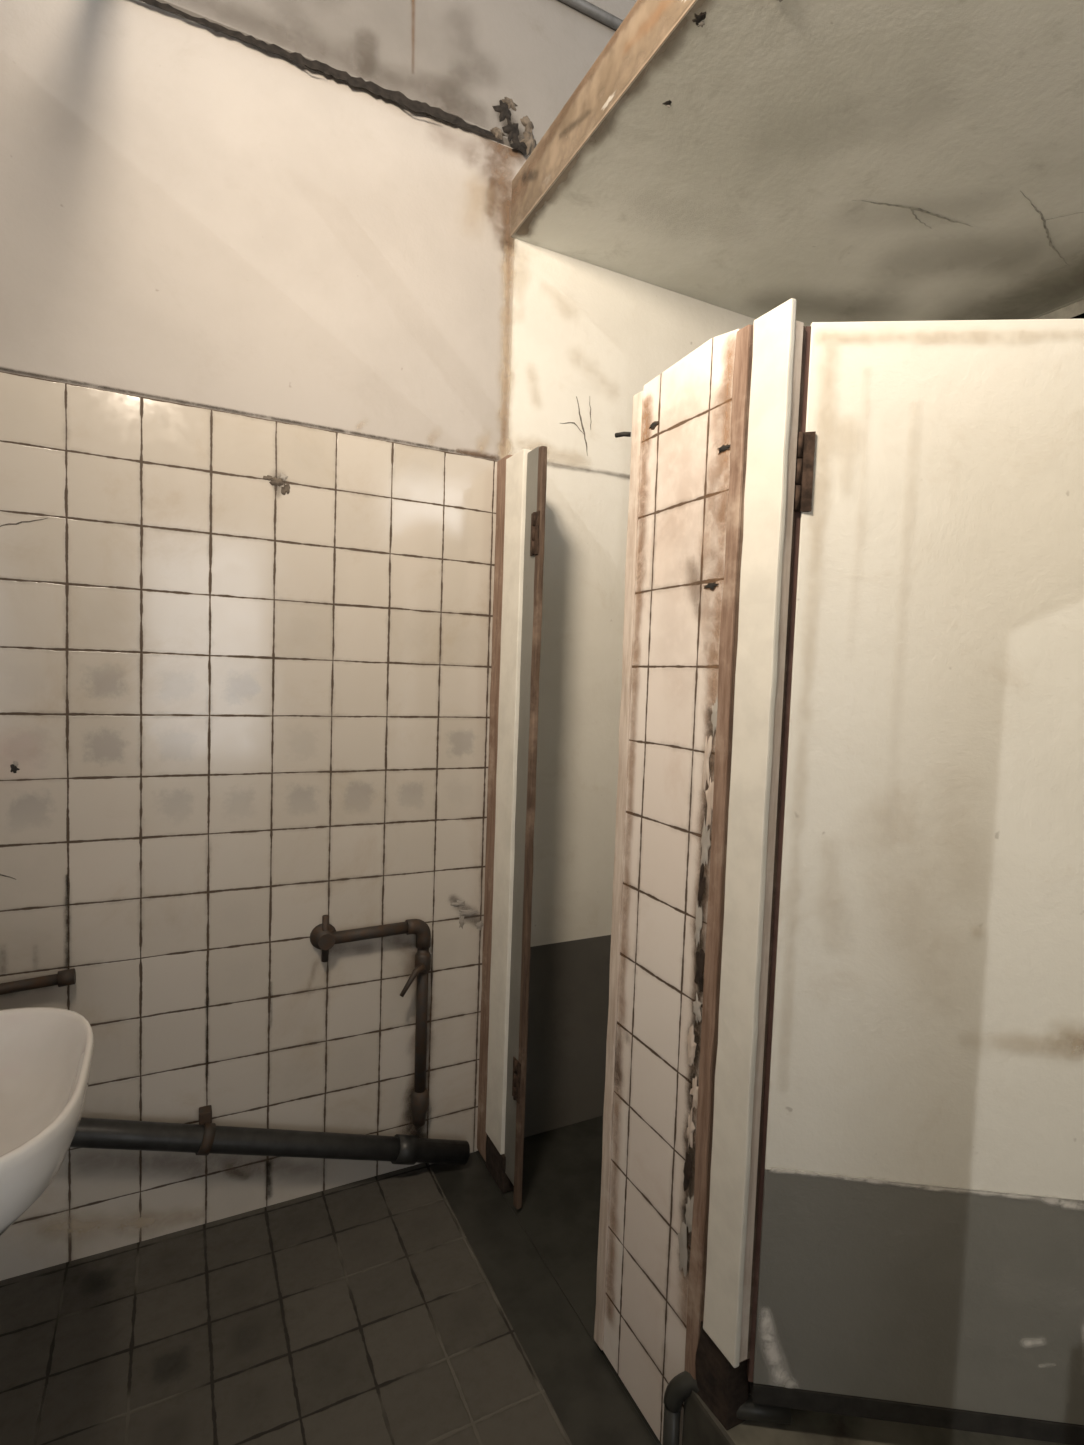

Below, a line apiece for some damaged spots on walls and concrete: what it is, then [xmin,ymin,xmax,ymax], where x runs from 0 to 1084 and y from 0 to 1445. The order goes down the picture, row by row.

corrosion [488,0,709,244]
crack [853,200,973,228]
crack [1020,191,1084,265]